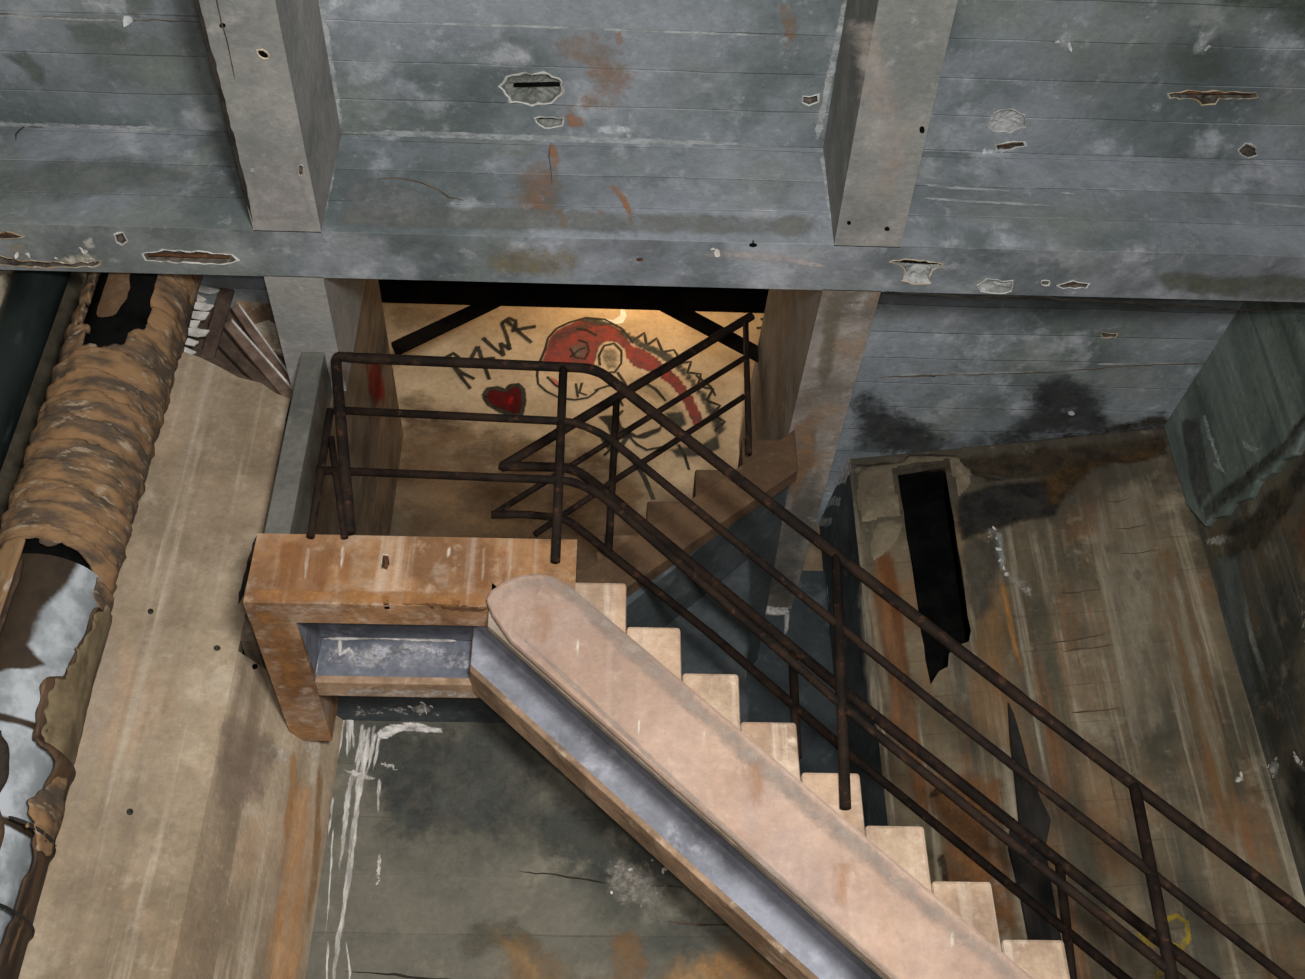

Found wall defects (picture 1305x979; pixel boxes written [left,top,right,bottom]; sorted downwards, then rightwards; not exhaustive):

spalling [488,46,565,129]
spalling [1167,90,1259,106]
spalling [0,231,102,269]
spalling [142,249,240,265]
spalling [889,259,944,285]
spalling [976,278,1013,294]
leakage [976,378,1105,445]
leakage [326,690,584,979]
crack [517,870,682,888]
crack [667,919,730,927]
crack [345,971,449,979]
corrosion [670,954,786,979]